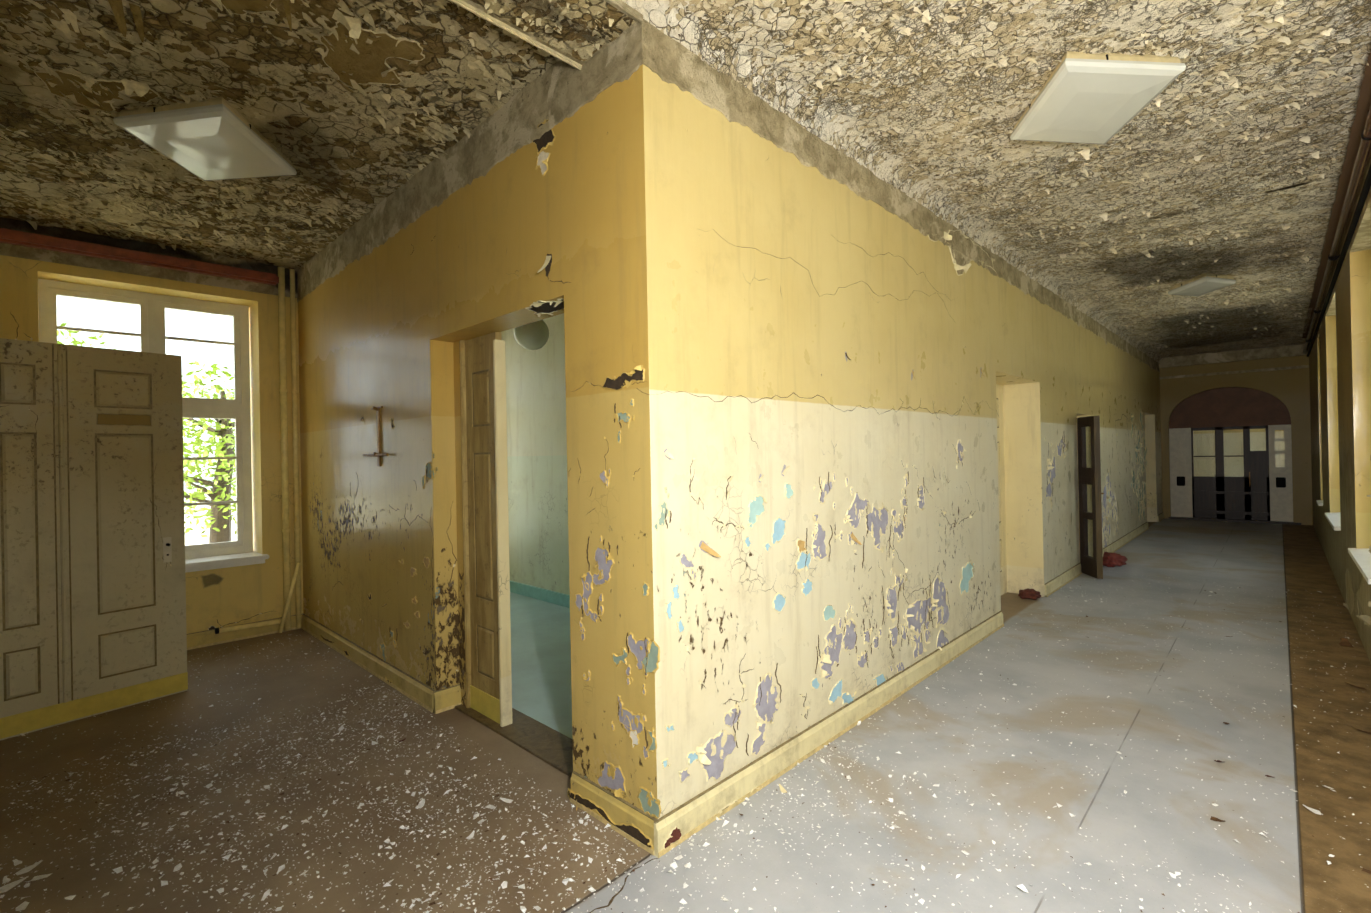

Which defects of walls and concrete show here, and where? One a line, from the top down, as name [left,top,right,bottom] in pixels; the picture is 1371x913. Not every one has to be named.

peeling [287,0,620,177]
peeling [693,0,765,20]
peeling [763,0,1062,103]
peeling [0,124,366,259]
peeling [907,0,1369,350]
peeling [537,254,552,276]
spalling [525,299,564,317]
crack [699,229,955,322]
peeling [601,365,645,444]
spalling [0,463,1371,913]
crack [589,858,659,913]